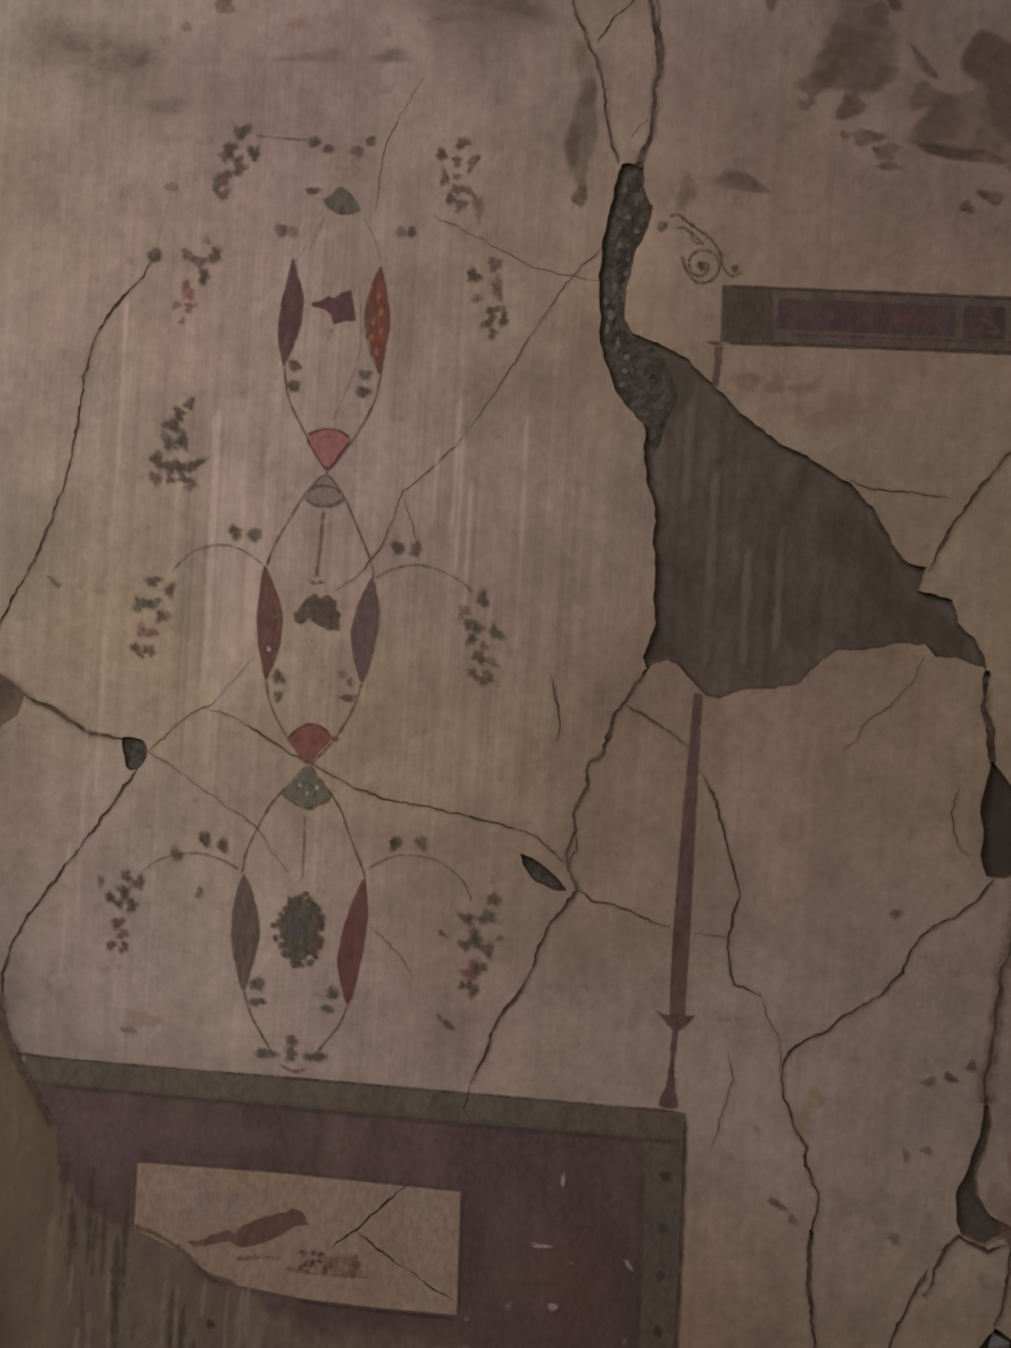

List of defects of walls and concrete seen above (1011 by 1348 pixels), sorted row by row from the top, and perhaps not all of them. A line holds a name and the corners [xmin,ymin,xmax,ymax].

crack [375,79,423,210]
crack [572,0,664,168]
water stain [912,31,1011,162]
crack [0,260,152,624]
crack [336,217,603,590]
flaking render [598,163,988,699]
crack [846,452,1011,571]
flaking render [122,737,147,771]
flaking render [520,854,567,891]
flaking render [980,760,1011,879]
crack [0,656,1011,1348]
flaking render [979,1328,1011,1348]